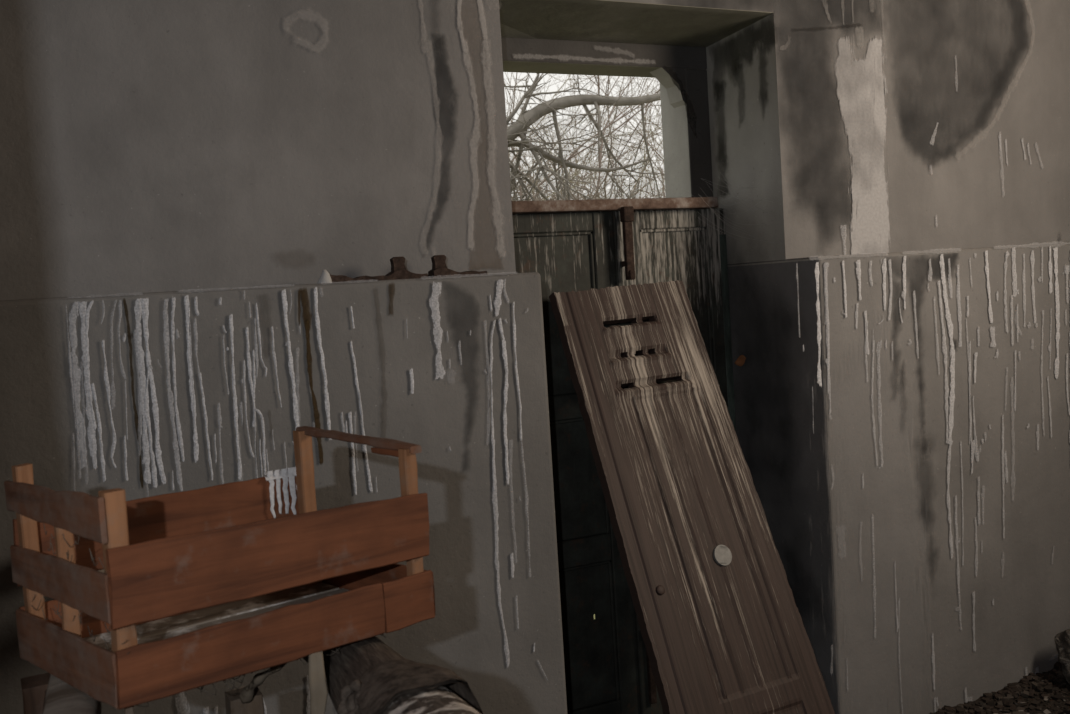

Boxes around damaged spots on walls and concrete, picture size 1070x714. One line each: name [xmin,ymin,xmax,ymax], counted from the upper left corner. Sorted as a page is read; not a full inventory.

water stain [435,38,456,137]
water stain [68,289,301,491]
water stain [314,287,378,495]
water stain [429,282,471,380]
water stain [457,0,522,667]
water stain [715,0,1036,651]
water stain [1036,246,1070,450]